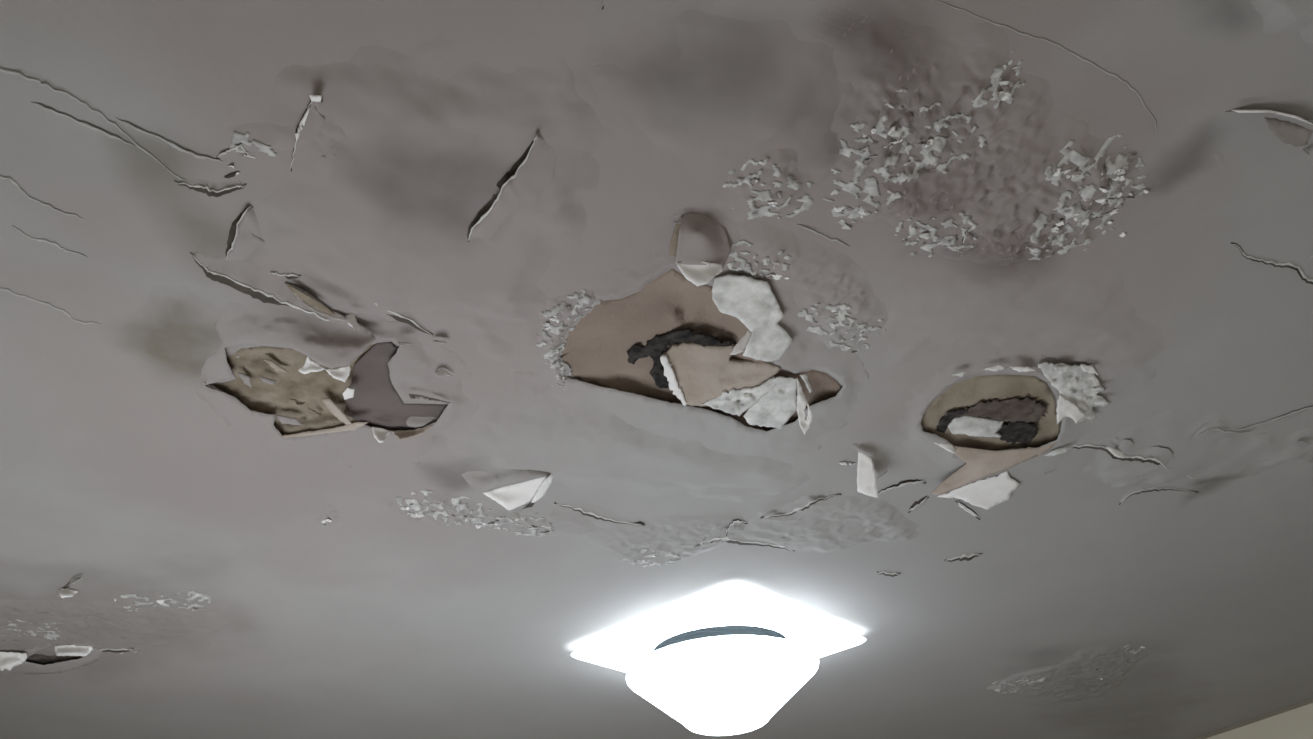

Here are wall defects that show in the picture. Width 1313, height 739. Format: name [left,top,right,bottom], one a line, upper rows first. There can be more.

crack [0,64,433,336]
spalling [193,300,479,468]
spalling [507,212,869,464]
spalling [839,352,1110,520]
peeling [1225,108,1313,155]
crack [1231,242,1313,284]
spalling [0,641,134,675]
peeling [57,576,84,598]